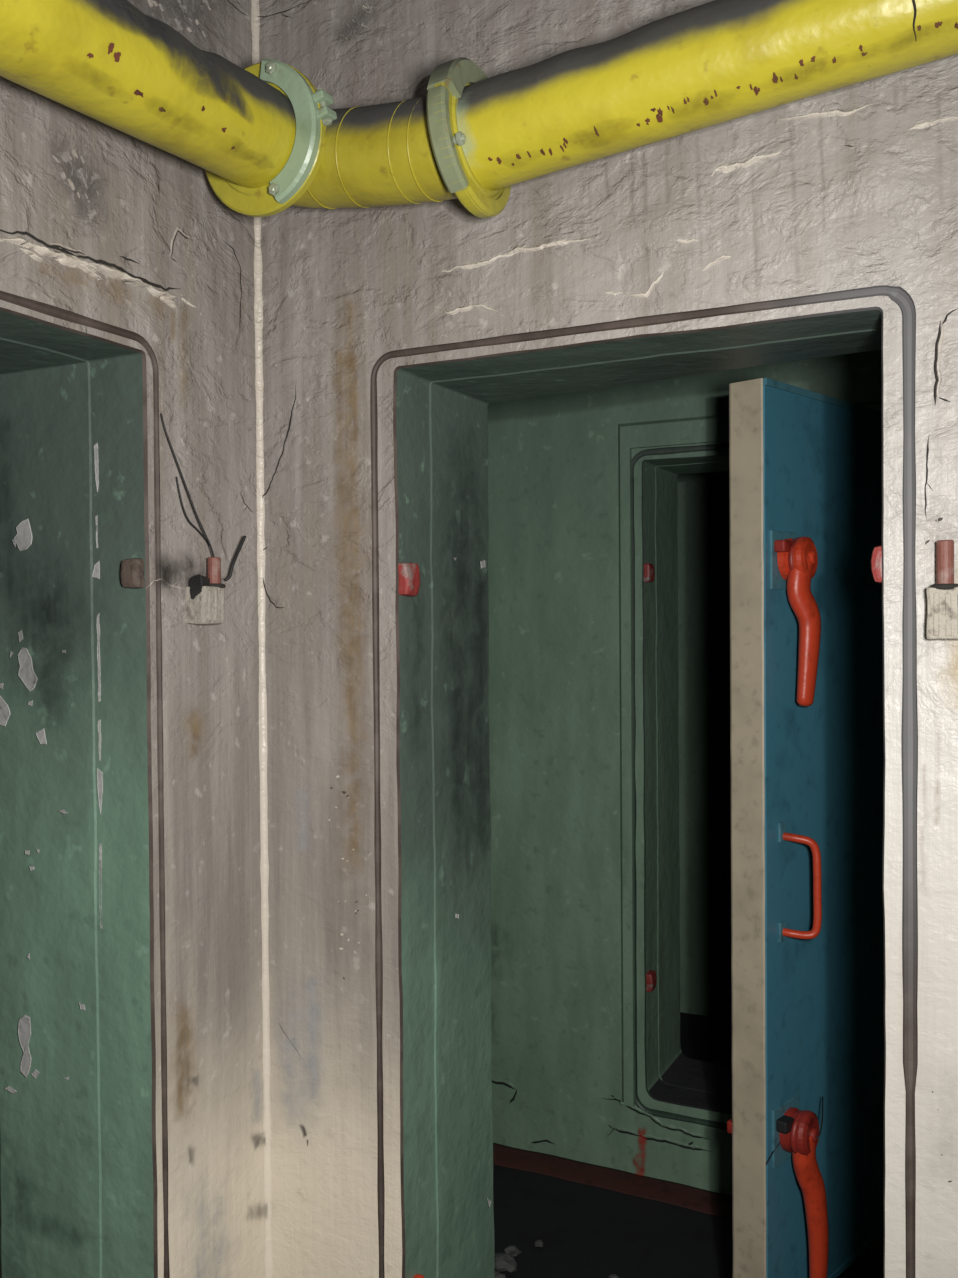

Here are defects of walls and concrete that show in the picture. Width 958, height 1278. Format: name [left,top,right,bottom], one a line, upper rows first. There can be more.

crack [51,243,85,255]
crack [170,227,242,326]
crack [934,308,958,406]
crack [924,437,933,519]
peeling [12,519,33,551]
peeling [10,630,38,706]
peeling [0,683,11,726]
peeling [36,729,47,744]
crack [492,1078,518,1103]
crack [601,1095,712,1152]